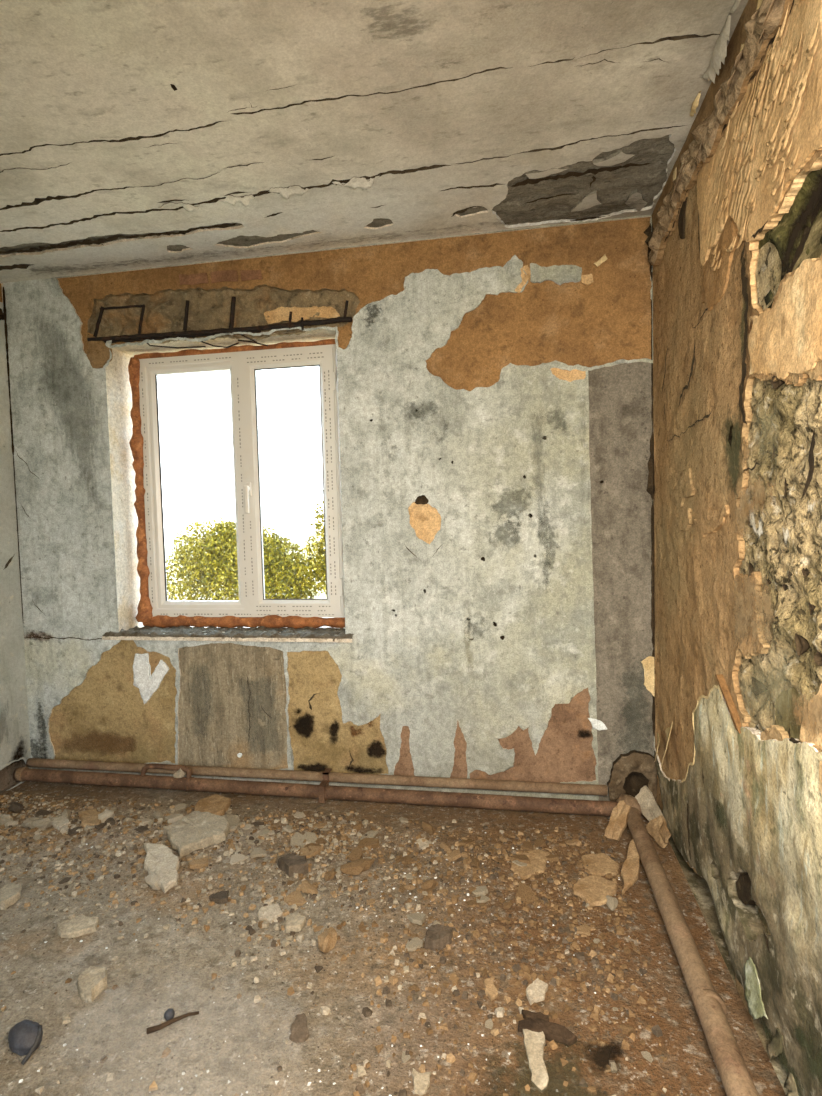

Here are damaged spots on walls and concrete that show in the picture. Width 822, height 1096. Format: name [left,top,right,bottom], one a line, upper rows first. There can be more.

crack [0,34,720,173]
crack [0,125,687,232]
crack [0,264,102,641]
peeling [654,373,822,1096]
leakage [716,802,727,827]
peeling [347,859,498,920]